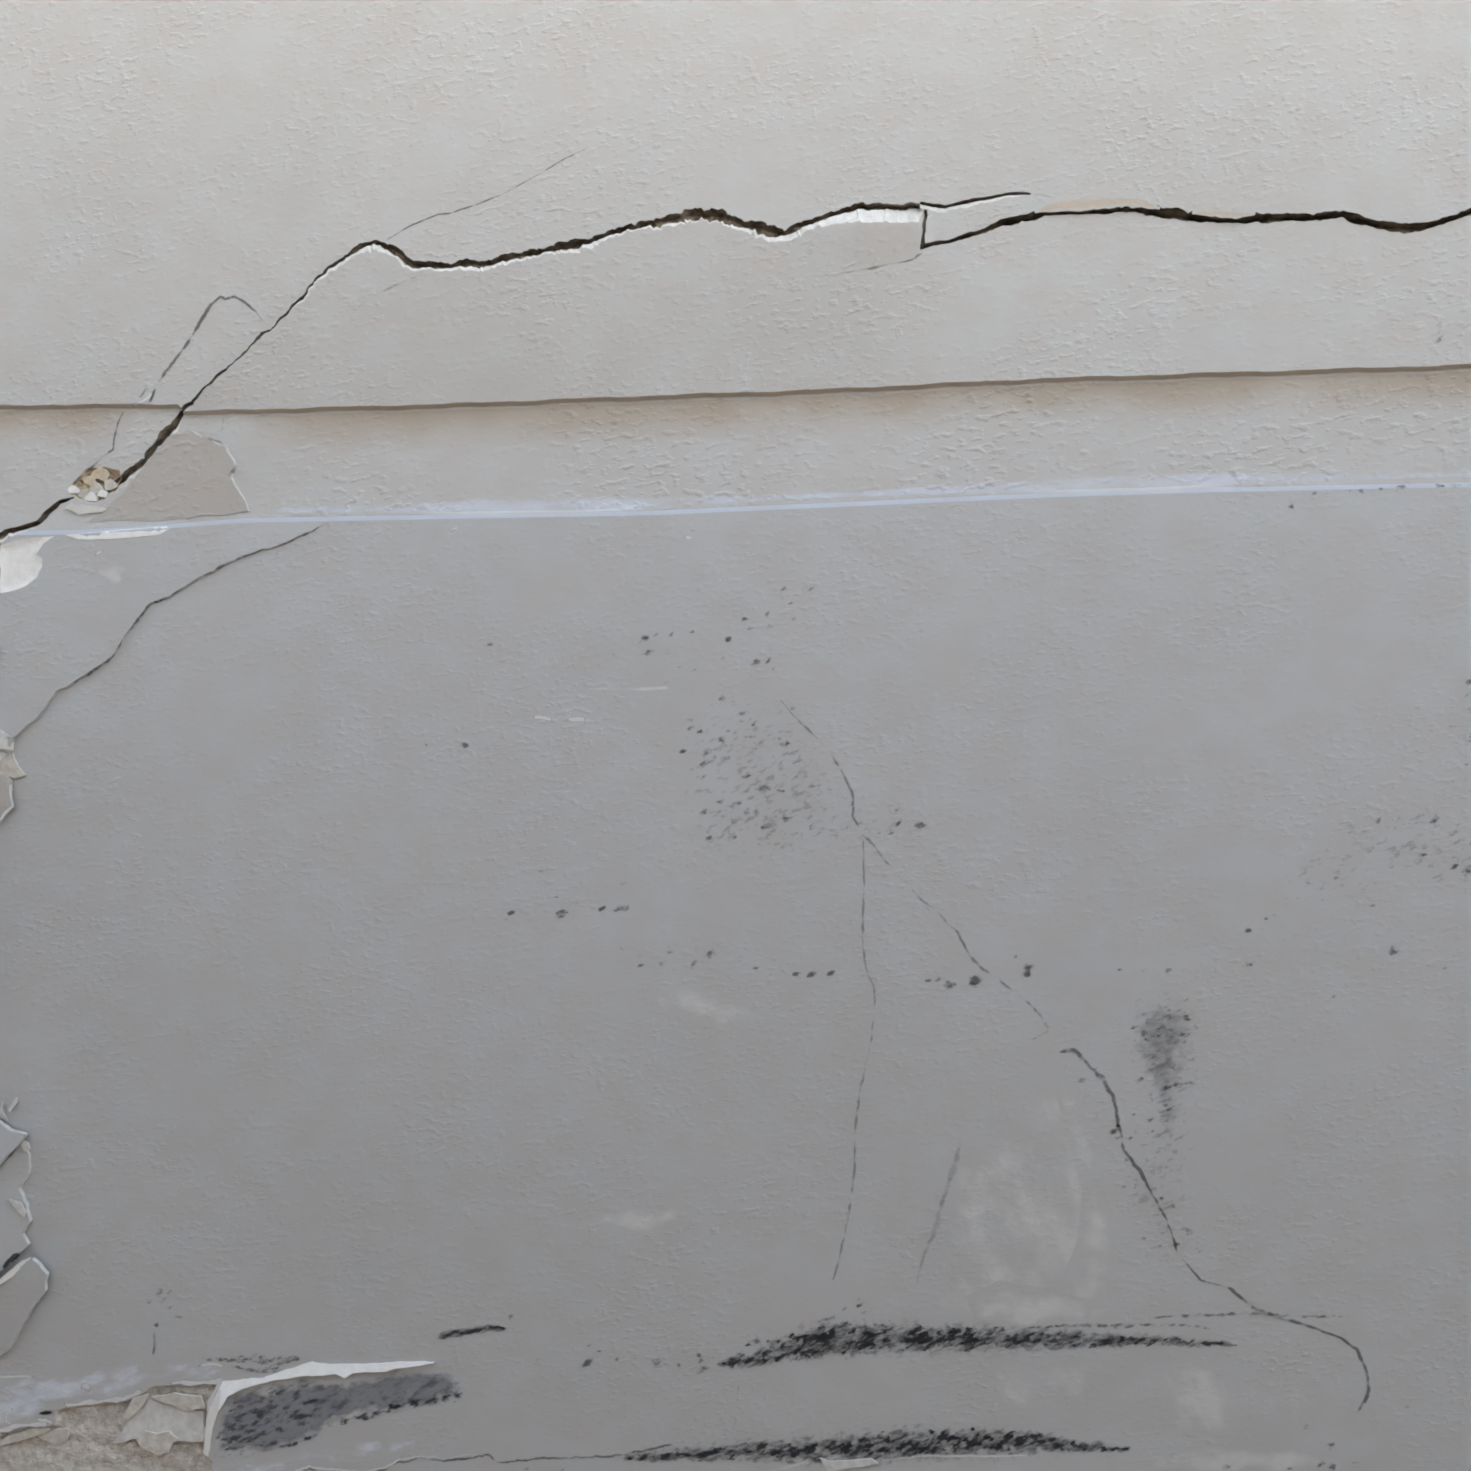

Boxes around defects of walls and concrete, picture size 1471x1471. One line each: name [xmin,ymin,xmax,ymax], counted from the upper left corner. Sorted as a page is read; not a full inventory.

crack [0,154,1471,544]
flaking render [65,466,122,515]
peeling [0,536,53,593]
crack [9,520,334,747]
flaking render [0,729,27,824]
peeling [0,1098,49,1356]
crack [1064,1048,1370,1409]
leakage [717,1314,1237,1366]
flaking render [0,1361,460,1471]
leakage [627,1427,1129,1463]